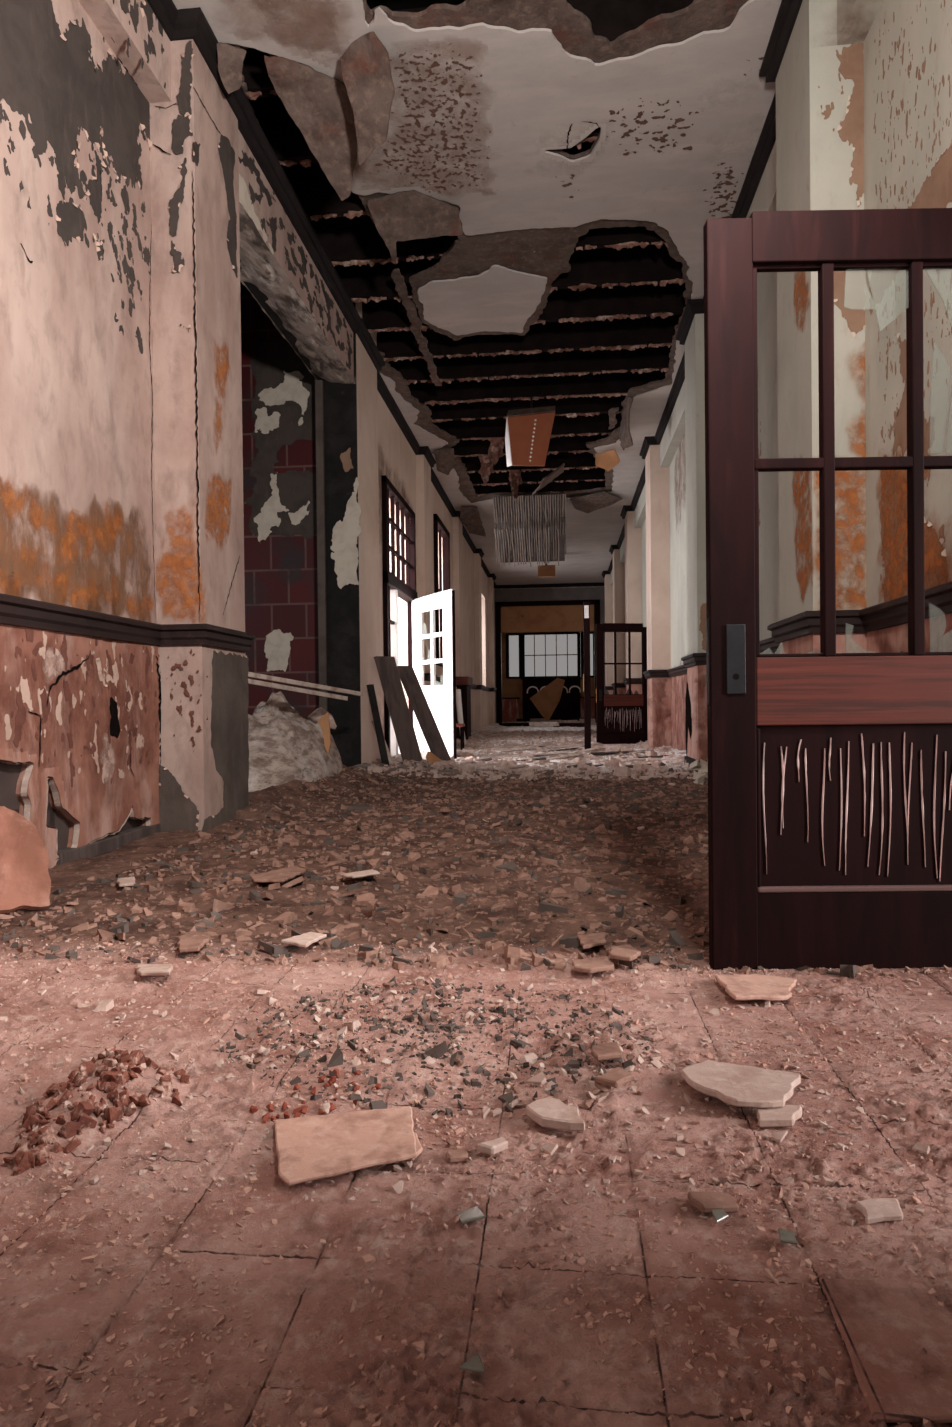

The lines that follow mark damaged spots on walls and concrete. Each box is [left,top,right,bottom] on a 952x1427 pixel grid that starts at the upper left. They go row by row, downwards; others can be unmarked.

crack [28,654,90,765]
peeling [0,0,200,354]
corrosion [3,476,230,622]
flaking render [0,629,250,866]
corrosion [215,345,229,436]
peeling [264,629,294,672]
peeling [218,134,353,370]
peeling [246,338,362,589]
peeling [820,0,952,209]
peeling [923,269,952,397]